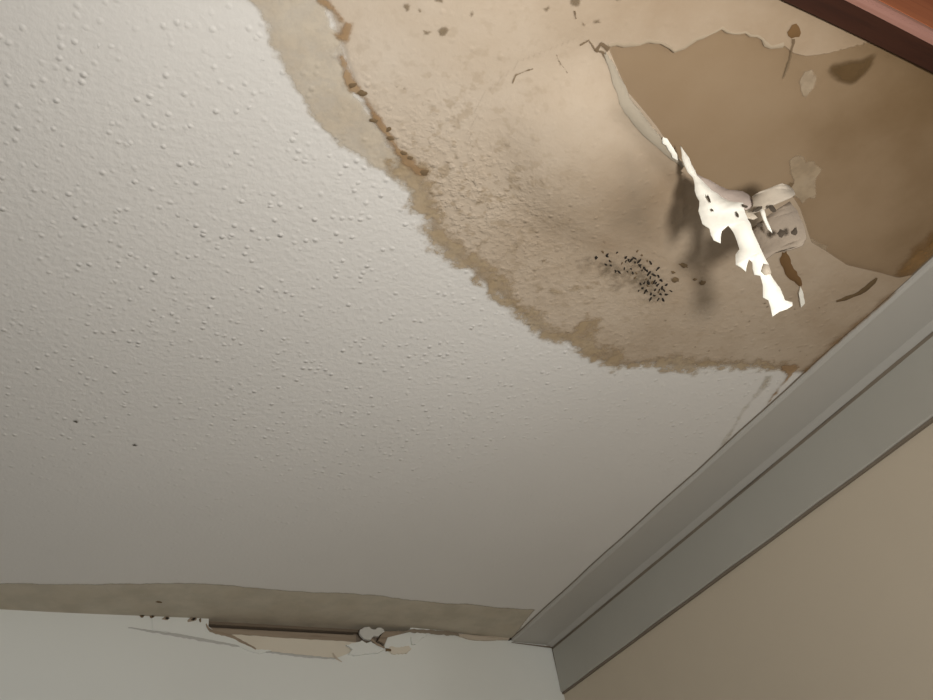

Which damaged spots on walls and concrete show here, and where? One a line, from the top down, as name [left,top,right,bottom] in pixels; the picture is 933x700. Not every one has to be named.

water stain [251,0,912,386]
flaking render [680,146,807,317]
flaking render [187,617,428,662]